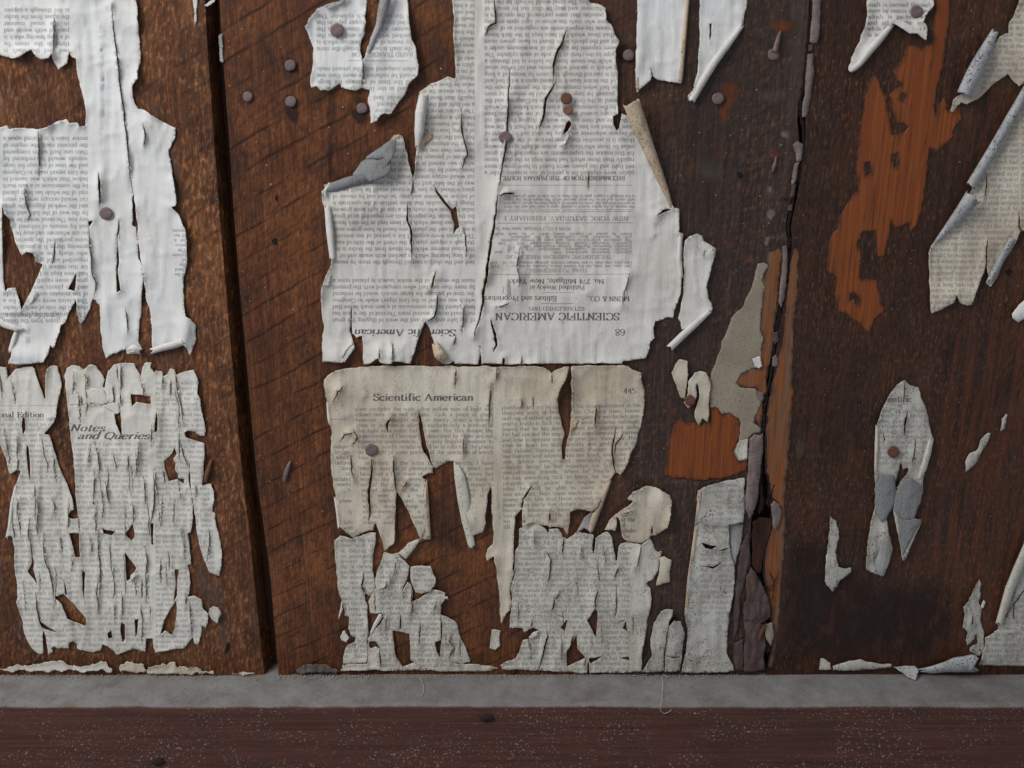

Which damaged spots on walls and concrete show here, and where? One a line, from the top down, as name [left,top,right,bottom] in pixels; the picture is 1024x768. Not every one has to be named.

peeling [635,0,747,102]
crack [783,0,812,281]
peeling [826,0,962,336]
peeling [334,237,800,674]
crack [758,305,782,514]
peeling [209,606,221,624]
crack [743,630,772,659]